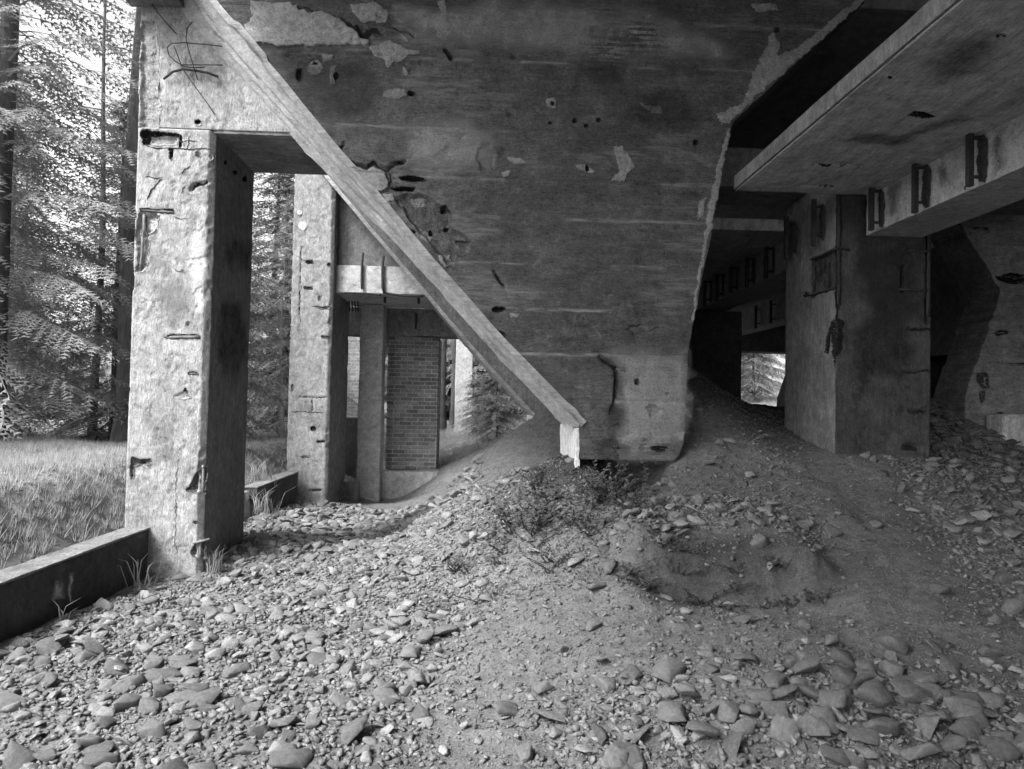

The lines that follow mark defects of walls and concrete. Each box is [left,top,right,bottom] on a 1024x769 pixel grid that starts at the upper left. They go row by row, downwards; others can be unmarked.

peeling [350,1,390,23]
spalling [296,54,338,85]
peeling [369,33,419,75]
peeling [612,146,635,182]
peeling [691,0,865,329]
spalling [382,193,472,272]